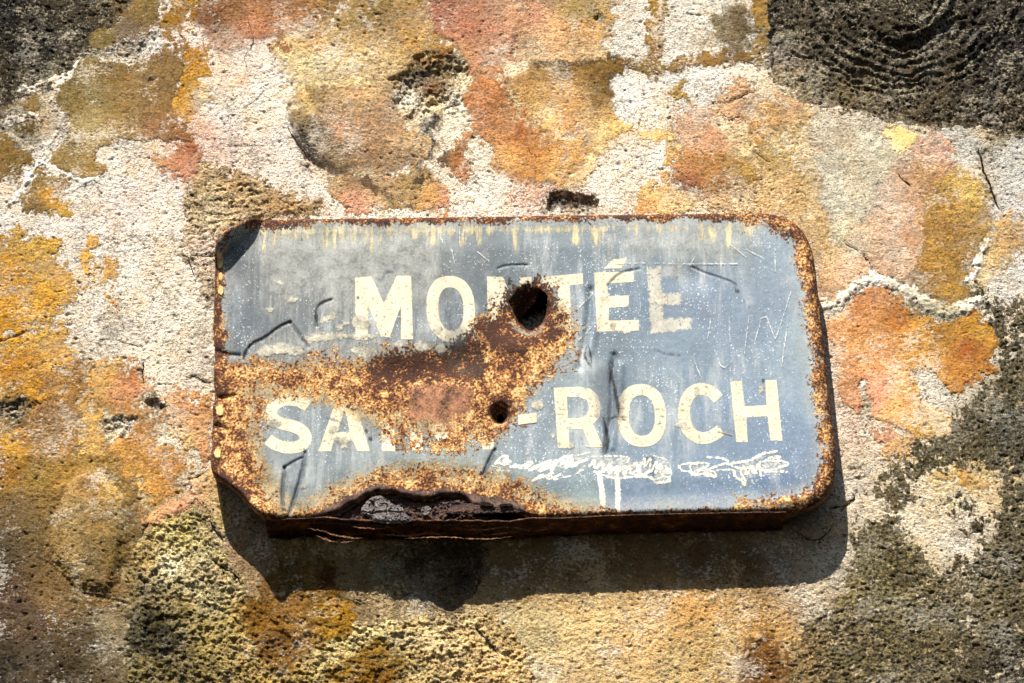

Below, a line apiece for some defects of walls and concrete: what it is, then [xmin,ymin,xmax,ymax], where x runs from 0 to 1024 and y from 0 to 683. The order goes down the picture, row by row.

crack [978,149,1001,210]